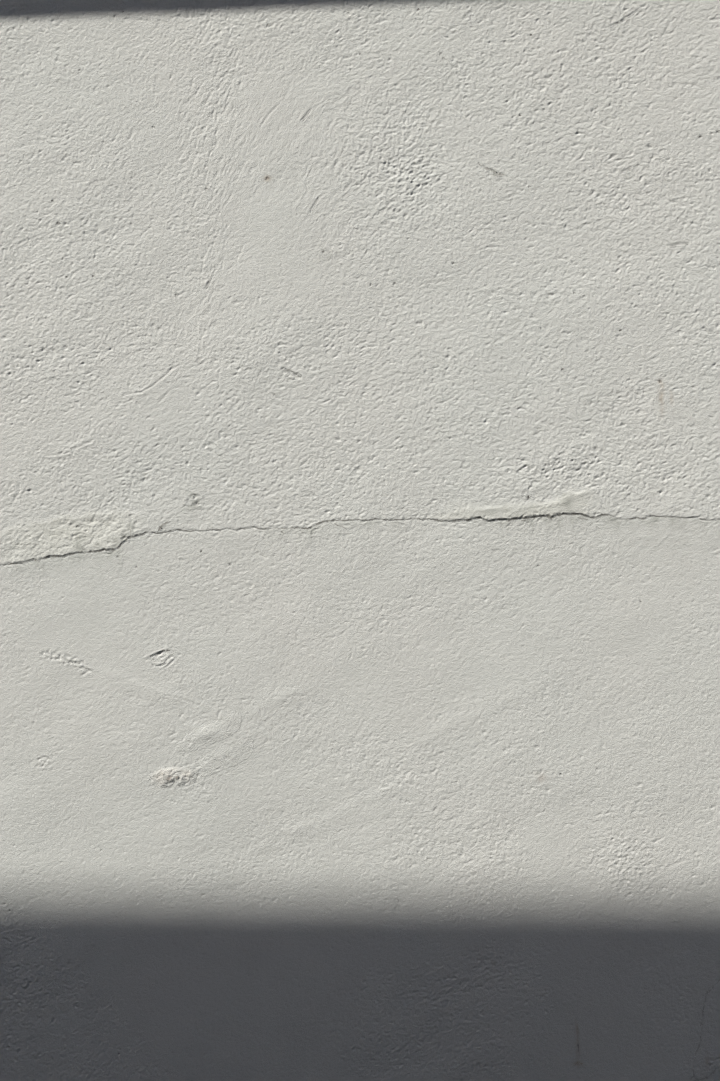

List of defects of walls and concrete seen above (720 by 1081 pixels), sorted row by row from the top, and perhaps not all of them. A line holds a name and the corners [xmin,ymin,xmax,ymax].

crack [0,512,720,566]